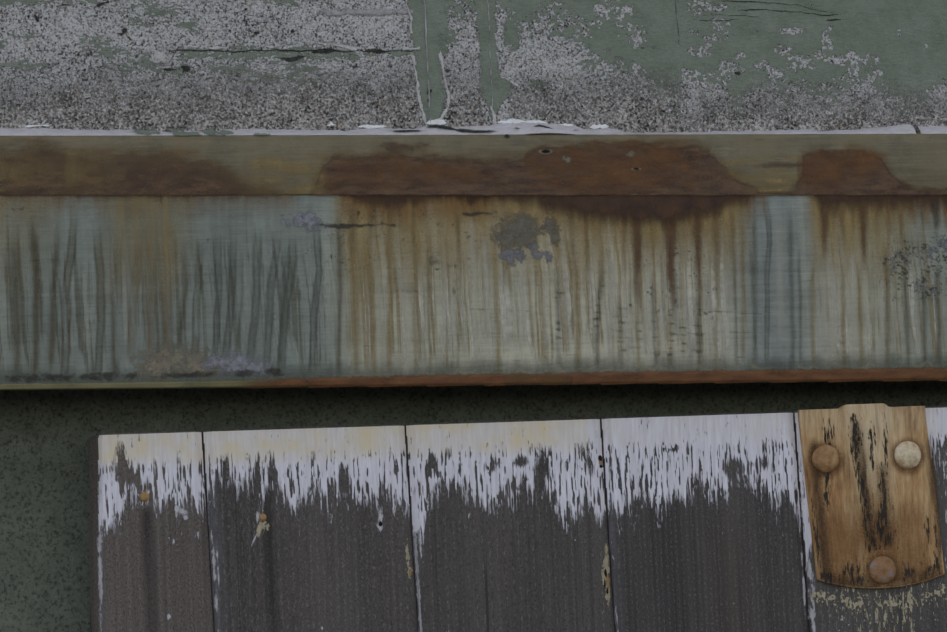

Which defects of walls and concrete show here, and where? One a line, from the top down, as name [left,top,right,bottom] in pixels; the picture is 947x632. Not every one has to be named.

peeling [0,0,947,138]
water stain [0,238,310,384]
peeling [281,212,395,231]
peeling [492,213,561,266]
water stain [339,195,901,377]
rust [311,143,947,294]
water stain [905,265,942,353]
peeling [98,413,812,579]
peeling [925,407,947,467]
peeling [601,543,611,606]